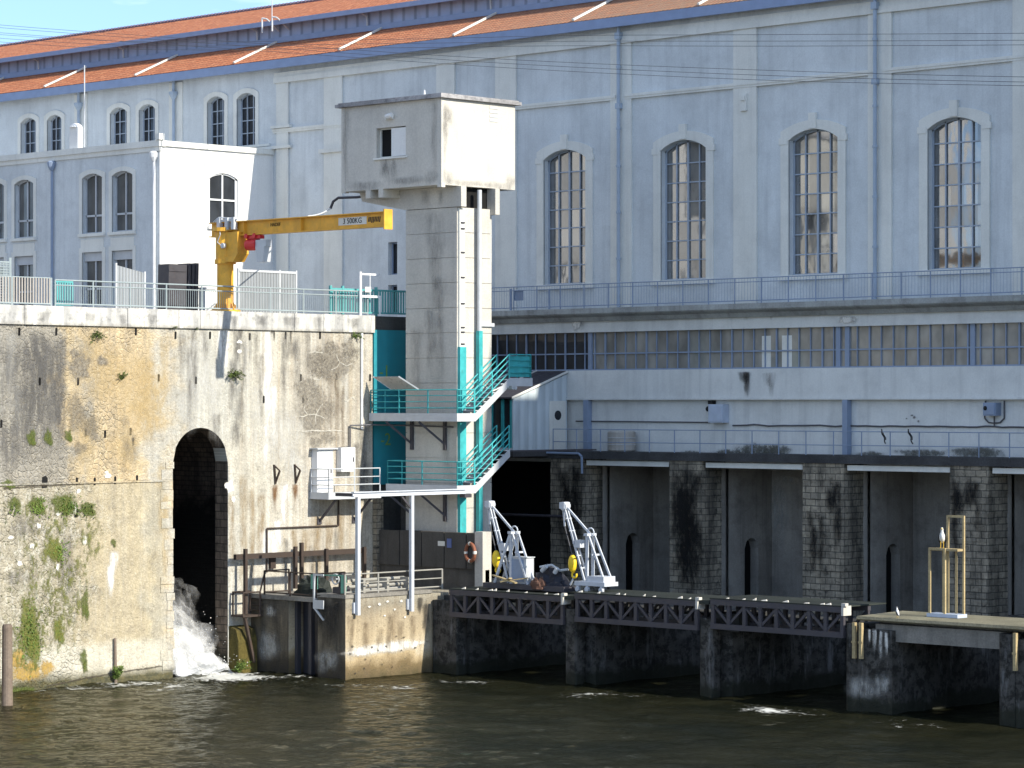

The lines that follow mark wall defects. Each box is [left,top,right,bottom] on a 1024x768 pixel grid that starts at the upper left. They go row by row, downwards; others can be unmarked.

crack [298,352,353,432]
water stain [672,470,704,583]
water stain [808,483,841,568]
water stain [952,481,979,547]